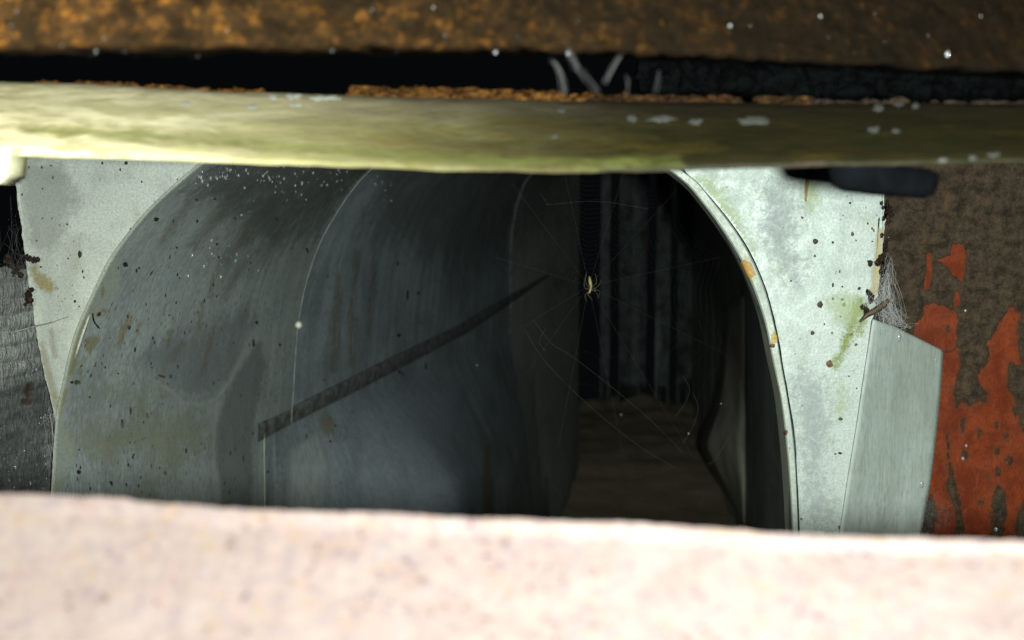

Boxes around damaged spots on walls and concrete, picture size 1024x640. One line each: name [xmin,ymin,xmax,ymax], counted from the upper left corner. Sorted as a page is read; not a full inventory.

water stain [833,298,867,369]